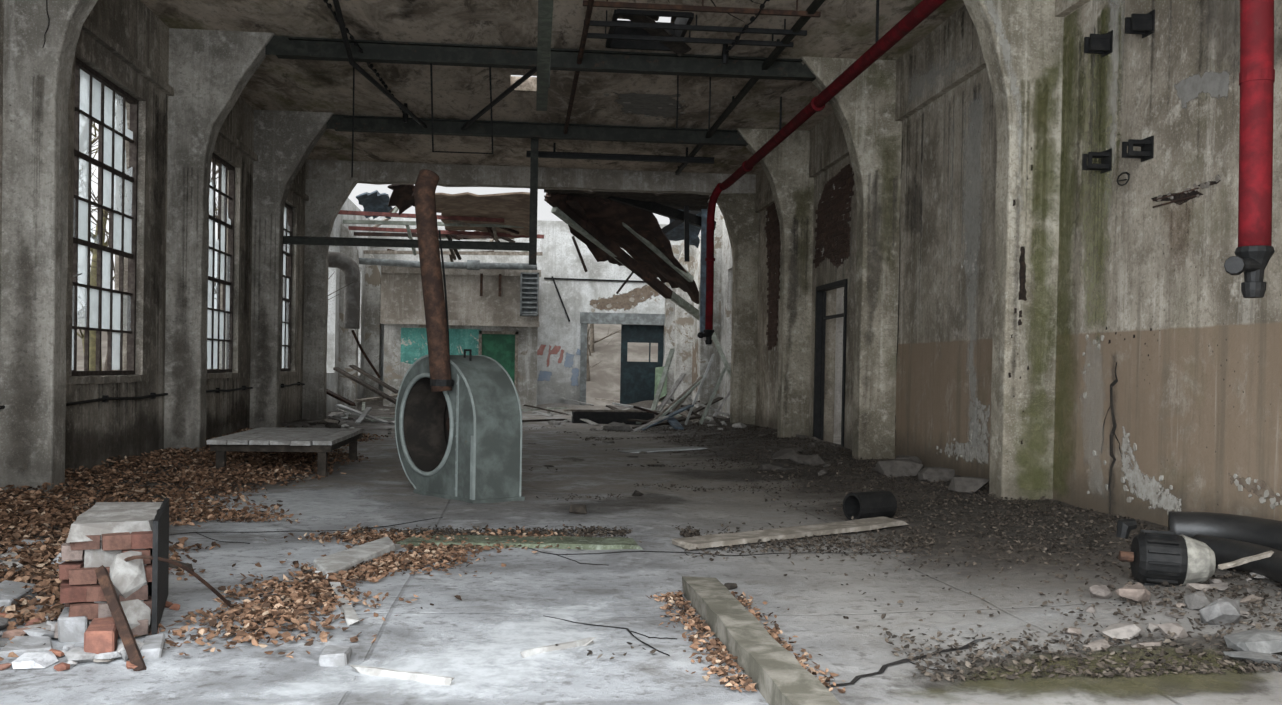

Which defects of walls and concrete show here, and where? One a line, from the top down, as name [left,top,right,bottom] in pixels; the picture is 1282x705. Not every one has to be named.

leakage [1097,7,1122,41]
flaking render [813,164,854,270]
leakage [1062,38,1121,344]
flaking render [764,203,781,351]
peeling [936,397,990,464]
crack [1101,362,1122,514]
peeling [1087,426,1193,515]